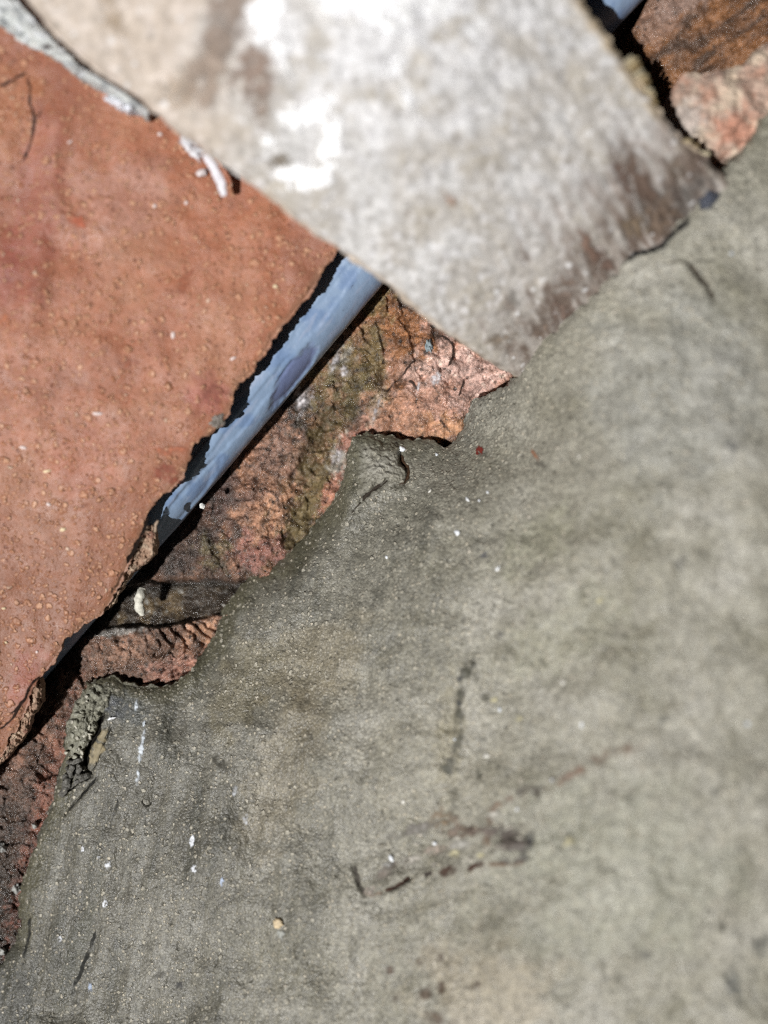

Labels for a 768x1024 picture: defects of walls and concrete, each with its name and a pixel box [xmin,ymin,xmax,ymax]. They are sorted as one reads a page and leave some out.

spalling [103,518,160,614]
spalling [0,634,73,764]
spalling [58,679,116,798]
spalling [364,812,533,895]
spalling [273,917,285,939]